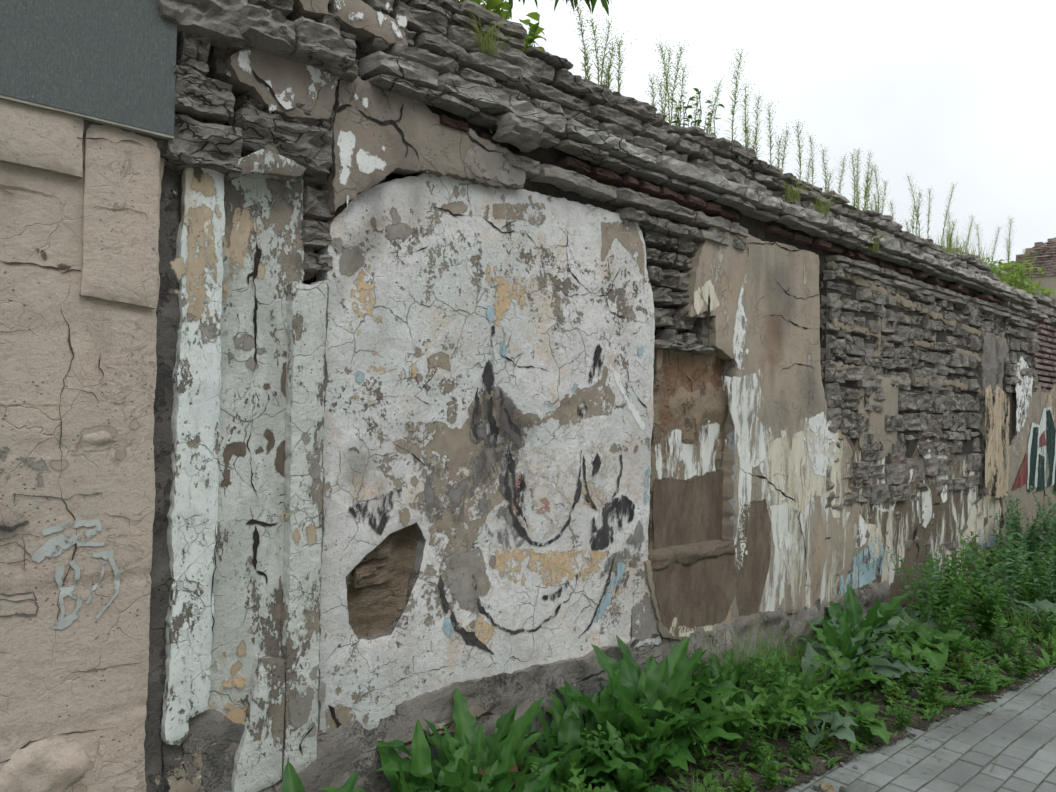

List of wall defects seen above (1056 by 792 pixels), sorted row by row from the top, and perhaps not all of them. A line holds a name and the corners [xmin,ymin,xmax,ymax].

crack [77,137,152,148]
crack [176,171,184,222]
crack [467,131,517,161]
spalling [435,128,551,226]
peeling [169,167,267,372]
peeling [331,234,383,335]
crack [431,207,653,338]
crack [0,260,124,649]
spalling [221,429,286,487]
peeling [346,355,647,648]
spalling [630,275,1034,647]
crack [0,725,121,763]